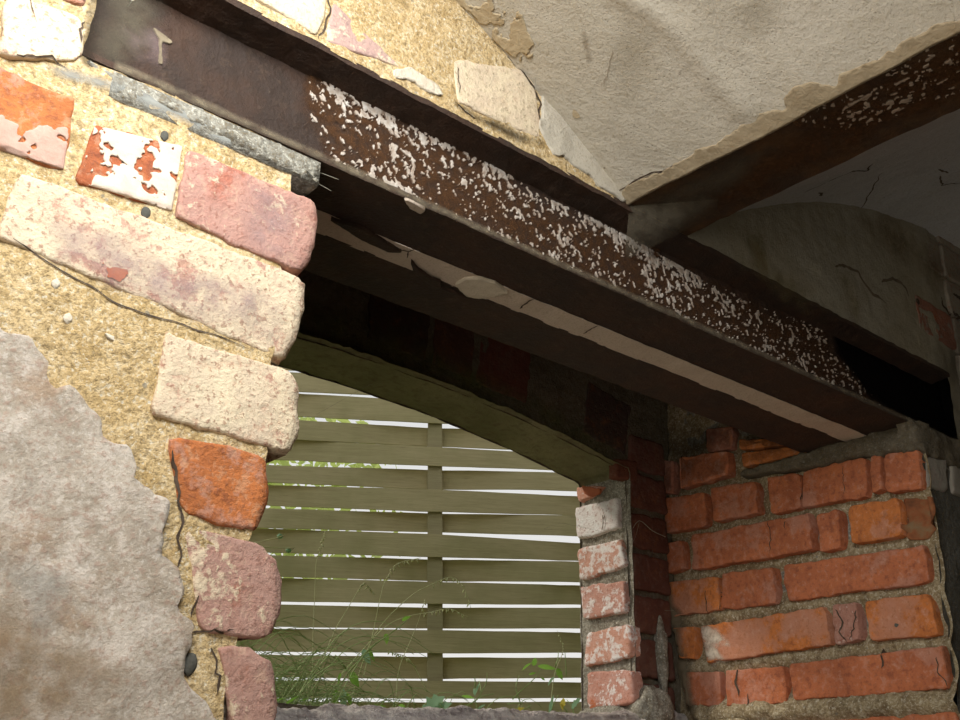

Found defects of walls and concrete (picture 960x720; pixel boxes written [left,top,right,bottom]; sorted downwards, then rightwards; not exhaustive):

flaking render [456,0,534,61]
peeling [0,115,69,170]
peeling [89,127,182,211]
corrosion [331,216,402,253]
corrosion [404,198,425,214]
corrosion [411,259,467,299]
crack [835,264,910,303]
flaking render [0,328,217,720]
crack [171,450,185,567]
crack [191,596,234,693]